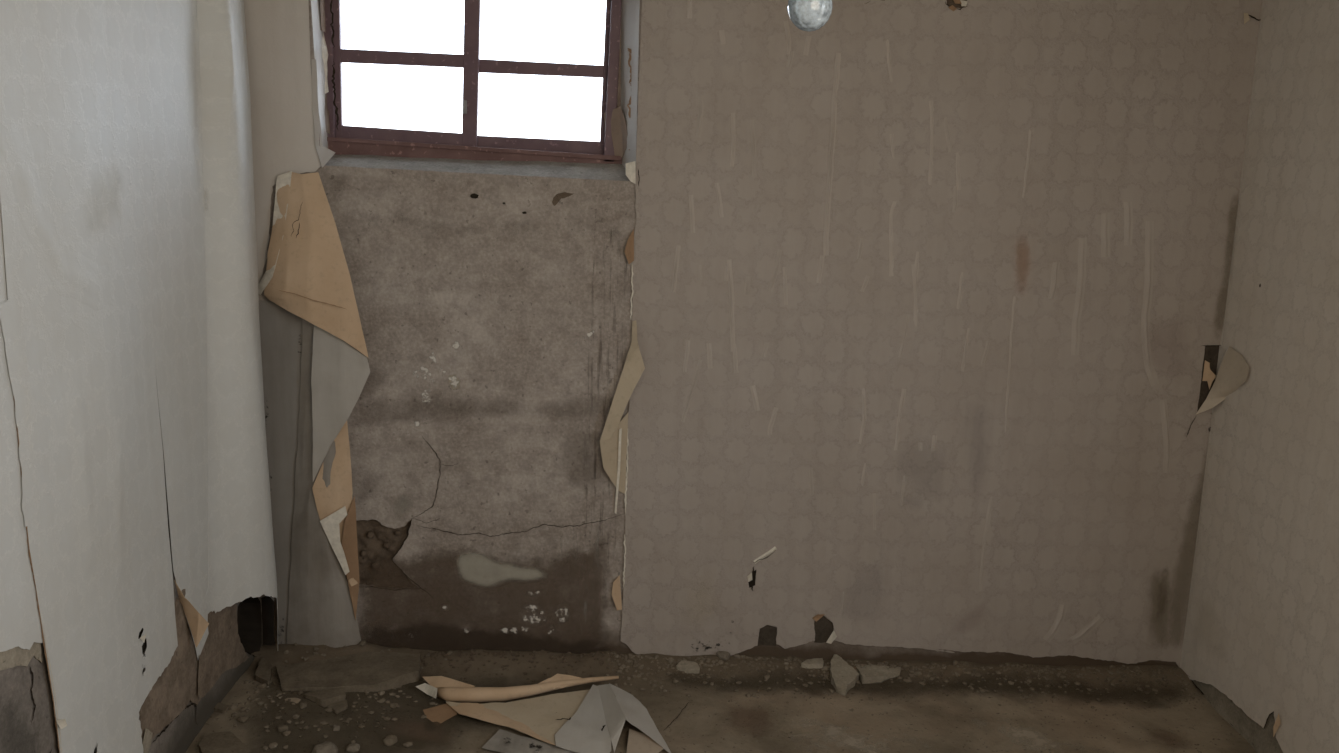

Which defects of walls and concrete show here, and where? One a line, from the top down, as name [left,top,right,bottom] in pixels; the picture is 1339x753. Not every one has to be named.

spalling [1197,346,1219,412]
crack [412,436,623,537]
flaking render [344,519,425,591]
leakage [365,544,606,654]
flaking render [0,642,42,723]
flaking render [139,589,453,753]